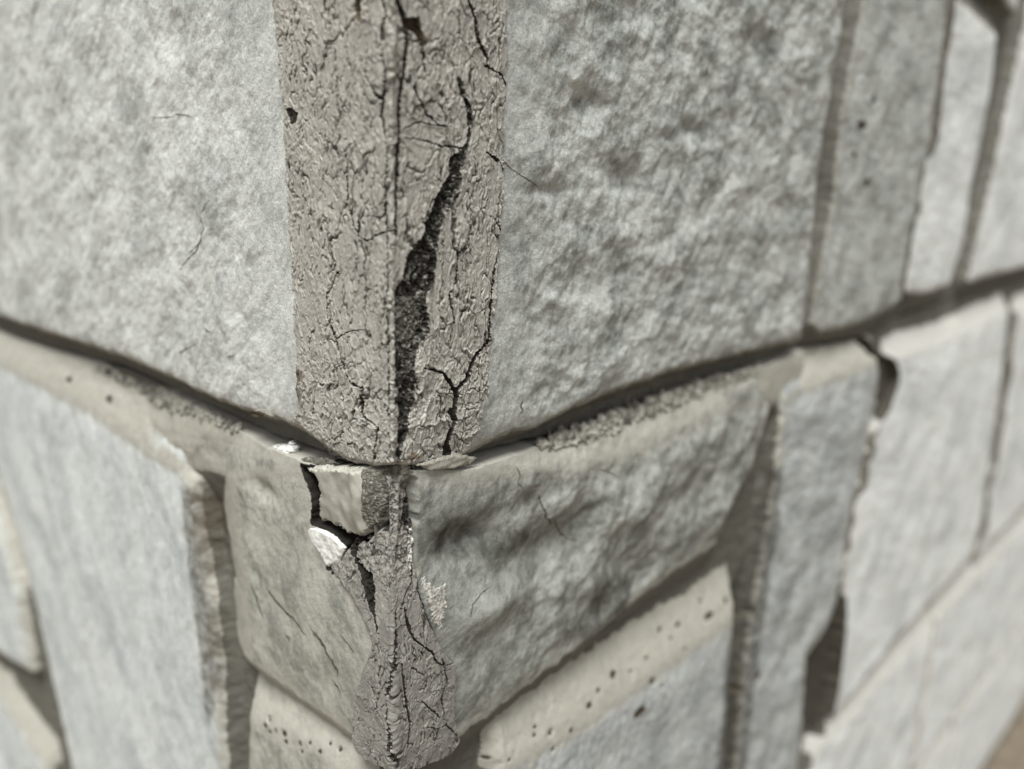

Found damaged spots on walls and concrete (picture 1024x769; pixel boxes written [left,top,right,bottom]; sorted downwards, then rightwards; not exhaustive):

crack [326,0,538,762]
peeling [308,527,347,567]
crack [249,583,354,694]